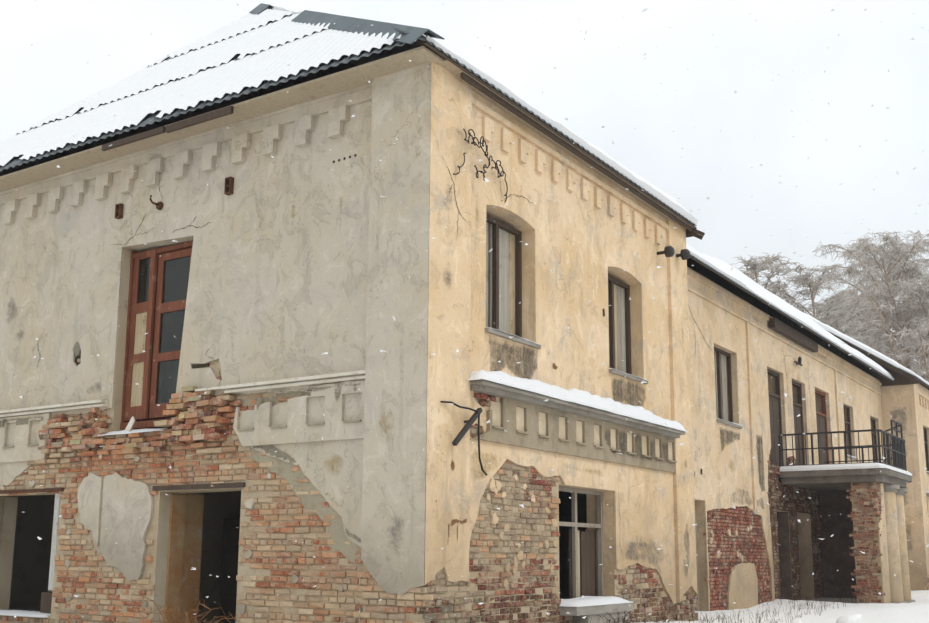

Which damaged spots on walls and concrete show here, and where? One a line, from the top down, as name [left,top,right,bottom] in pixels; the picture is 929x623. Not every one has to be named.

crack [111,193,212,245]
water stain [491,342,535,379]
water stain [613,379,644,406]
flaking render [0,385,574,623]
flaking render [703,452,825,611]
flaking render [614,564,698,623]